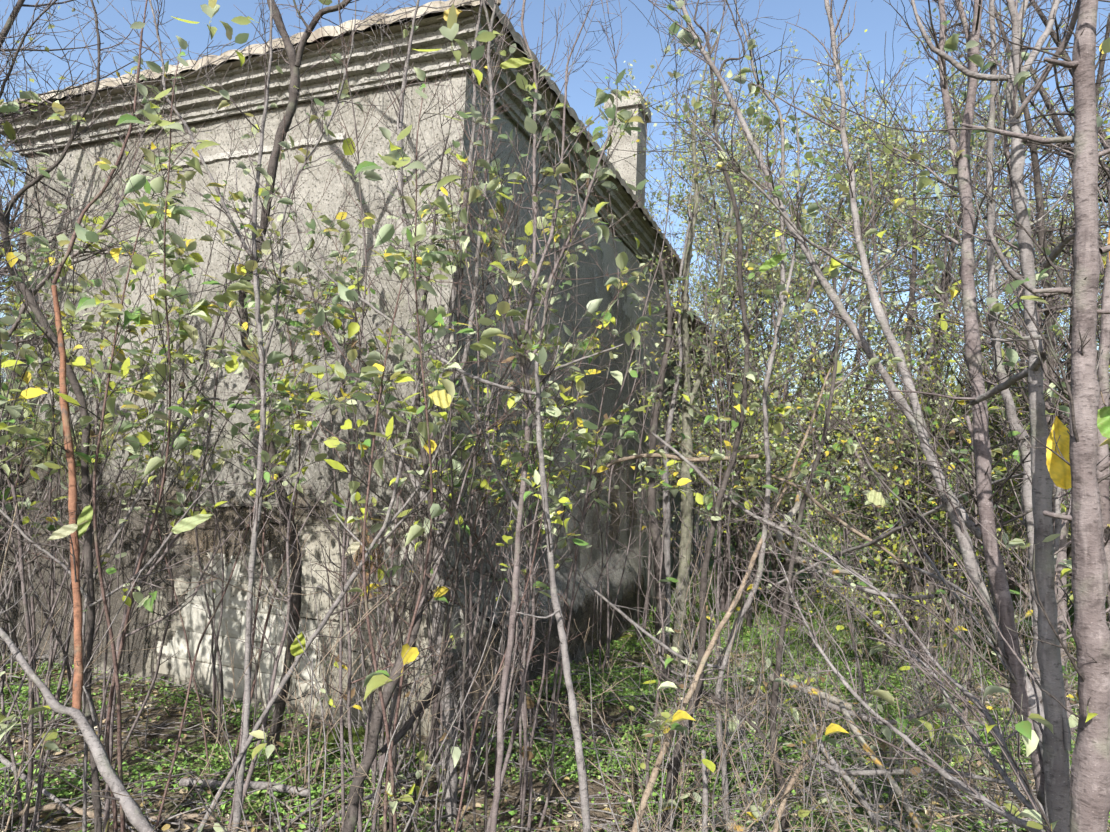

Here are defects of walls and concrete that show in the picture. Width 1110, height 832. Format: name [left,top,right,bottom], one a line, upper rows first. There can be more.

flaking render [145,552,339,715]